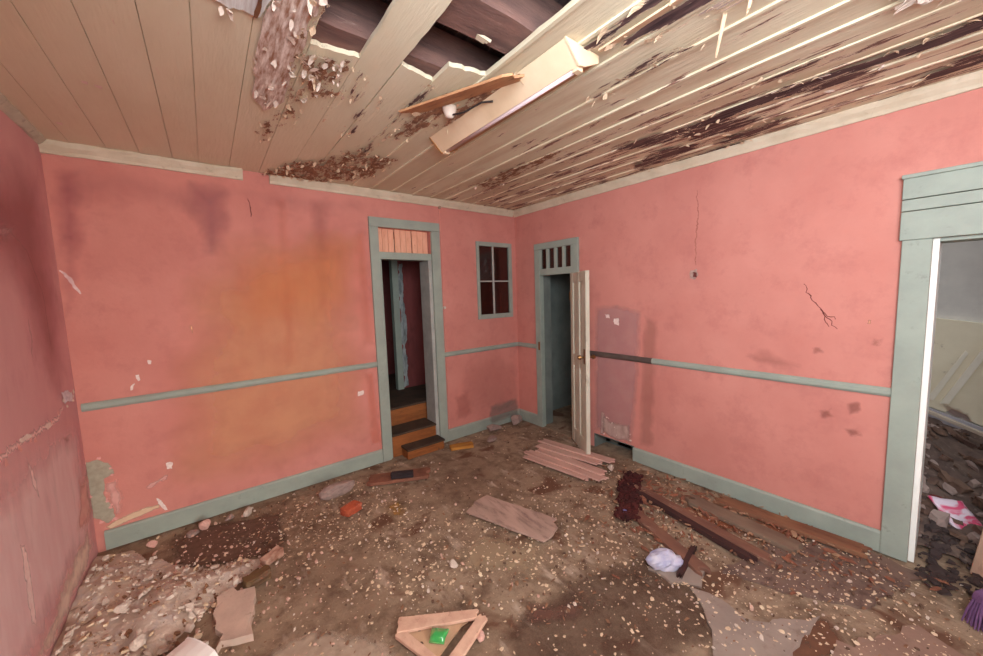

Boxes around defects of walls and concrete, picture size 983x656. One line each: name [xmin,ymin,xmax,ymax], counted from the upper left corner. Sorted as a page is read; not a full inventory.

peeling [216,0,382,143]
peeling [261,84,500,183]
peeling [584,0,714,106]
peeling [609,17,983,172]
peeling [889,0,945,15]
crack [804,284,837,329]
spalling [80,457,168,528]